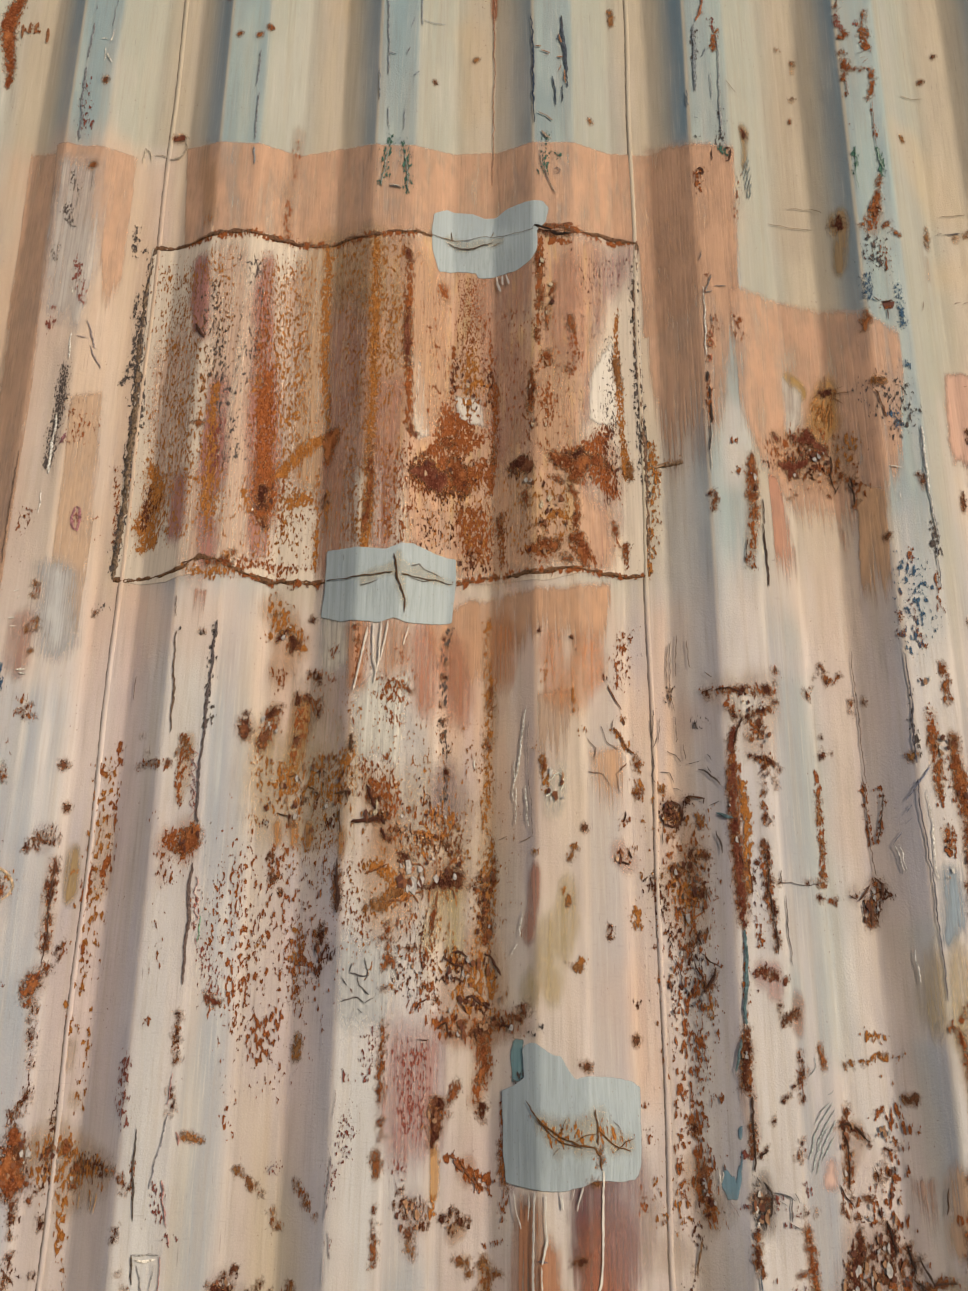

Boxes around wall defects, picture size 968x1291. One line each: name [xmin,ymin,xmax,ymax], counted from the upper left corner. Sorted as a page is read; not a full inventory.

rust [0,0,50,89]
rust [837,10,879,145]
rust [883,519,946,655]
rust [93,200,896,1291]
rust [904,662,968,863]
rust [0,727,194,1291]
rust [931,955,968,1083]
rust [947,1167,968,1257]